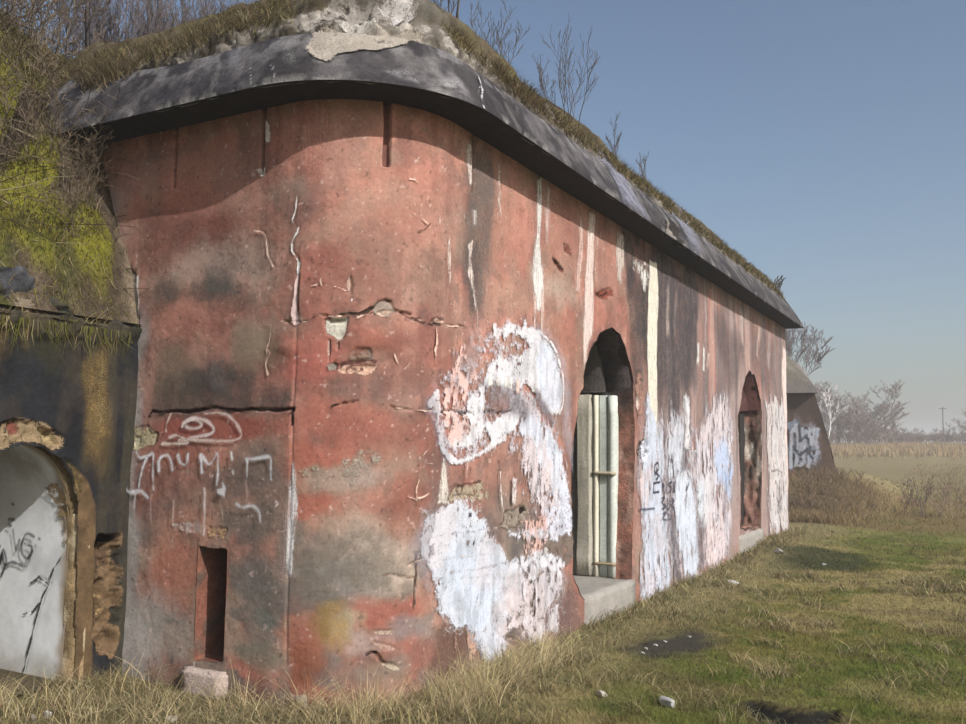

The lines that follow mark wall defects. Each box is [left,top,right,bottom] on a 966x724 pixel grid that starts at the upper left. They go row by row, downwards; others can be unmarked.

spalling [301,0,426,61]
spalling [325,317,377,375]
water stain [464,142,502,311]
efflorescence [533,178,550,335]
efflorescence [576,212,598,364]
water stain [616,232,709,470]
spalling [0,418,64,450]
spalling [44,483,68,544]
crack [149,406,295,426]
peeling [444,480,489,503]
water stain [716,305,788,529]
spalling [91,533,124,660]